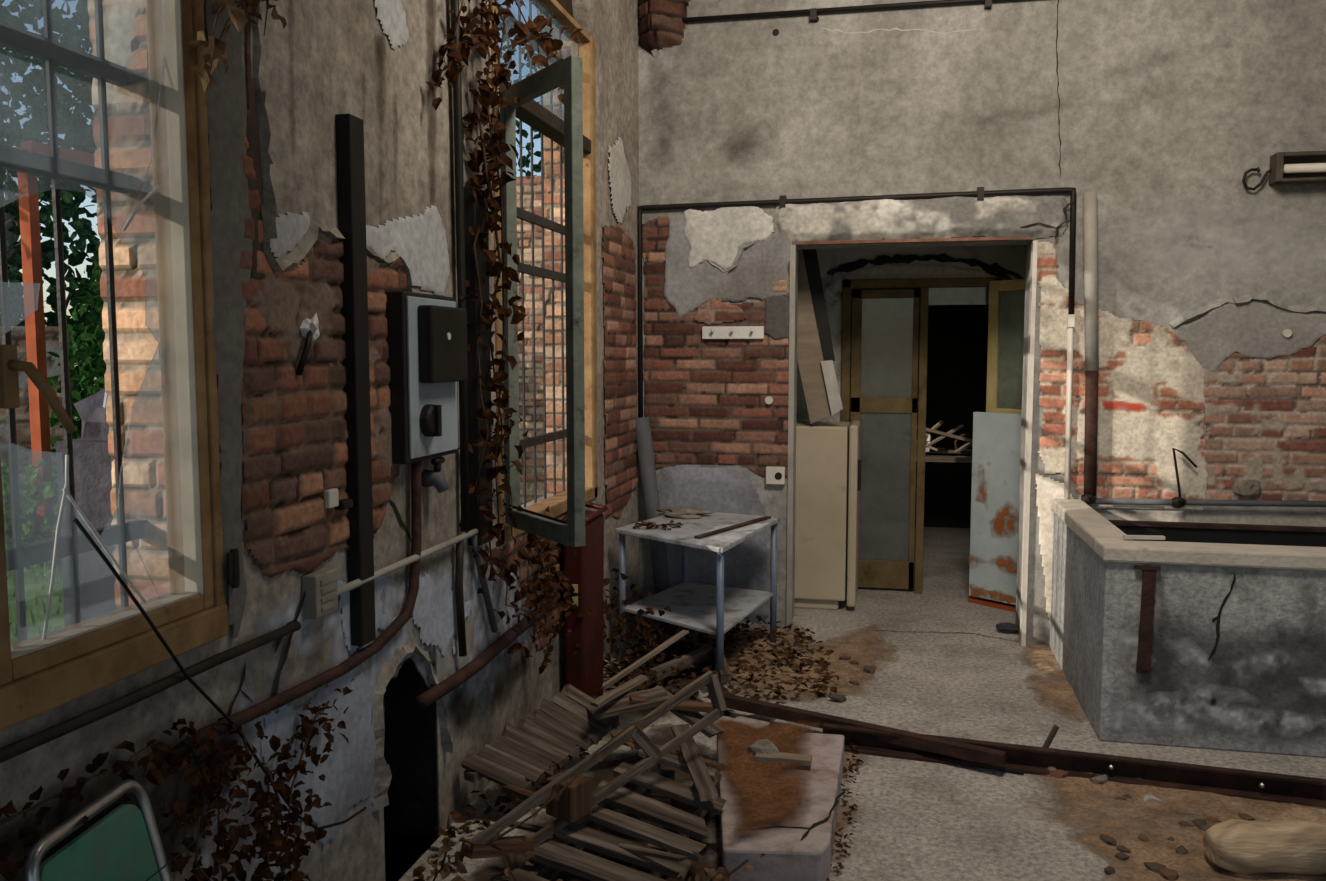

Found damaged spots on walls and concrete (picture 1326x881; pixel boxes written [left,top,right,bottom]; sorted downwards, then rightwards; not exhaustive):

peeling [375,0,409,50]
spalling [638,0,691,58]
flaking render [239,0,350,578]
flaking render [366,205,450,539]
flaking render [602,137,790,519]
crack [827,253,1024,280]
flaking render [1035,242,1326,623]
rust [992,506,1016,535]
rust [971,587,1016,603]
rust [996,557,1017,574]
crack [1208,573,1236,661]
water stain [1114,628,1326,737]